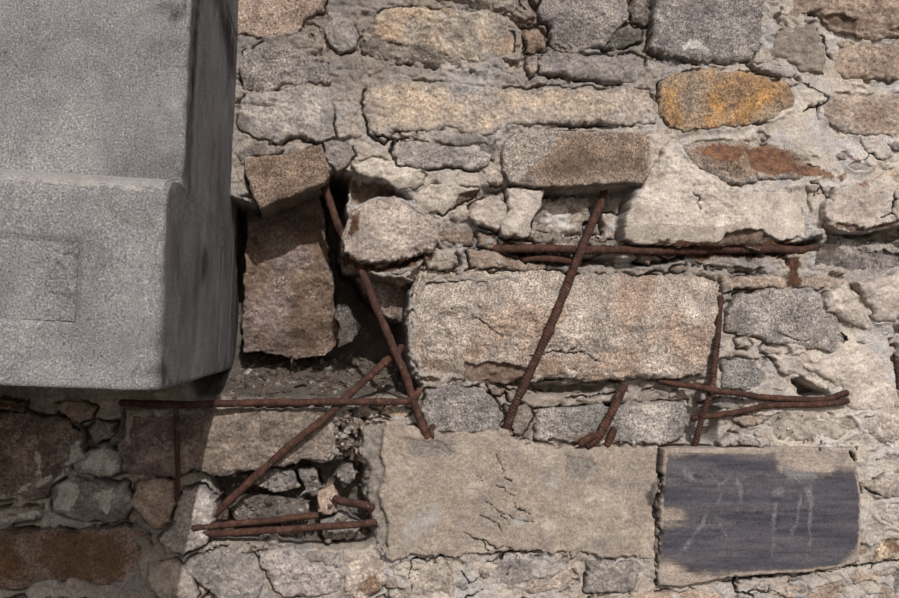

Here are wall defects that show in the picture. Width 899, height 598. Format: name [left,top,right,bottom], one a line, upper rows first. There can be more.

water stain [220,0,237,73]
water stain [168,1,200,182]
spalling [321,184,344,241]
corrosion [348,213,359,235]
spalling [350,180,396,204]
corrosion [343,251,434,273]
corrosion [503,241,528,264]
corrosion [656,238,812,286]
spalling [119,262,453,554]
crack [409,454,539,598]
crack [721,558,899,598]